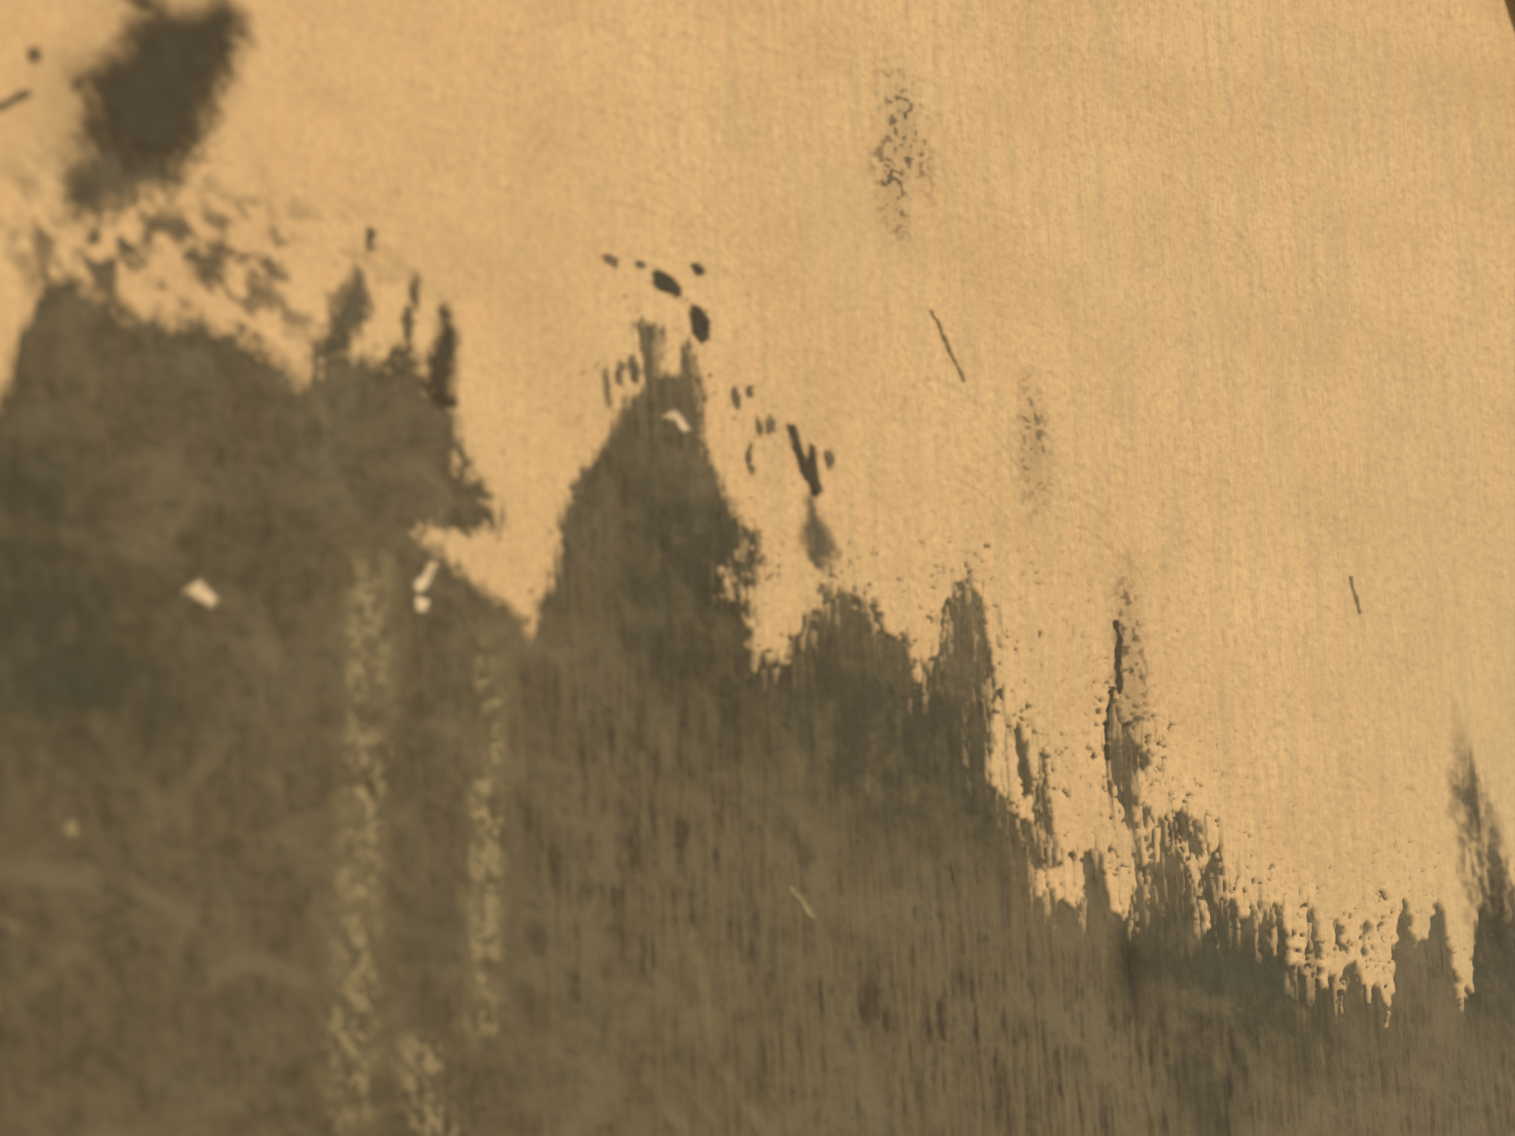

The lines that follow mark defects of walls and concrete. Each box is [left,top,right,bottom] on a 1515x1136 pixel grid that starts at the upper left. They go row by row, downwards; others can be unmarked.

leakage [367,228,376,249]
leakage [330,269,370,353]
leakage [402,274,420,350]
leakage [425,308,457,407]
leakage [732,386,753,409]
leakage [746,419,835,568]
leakage [840,680,991,812]
leakage [328,557,392,1122]
leakage [467,640,507,1037]
leakage [1454,782,1515,985]
leakage [1154,919,1322,1033]
leakage [398,1036,457,1136]